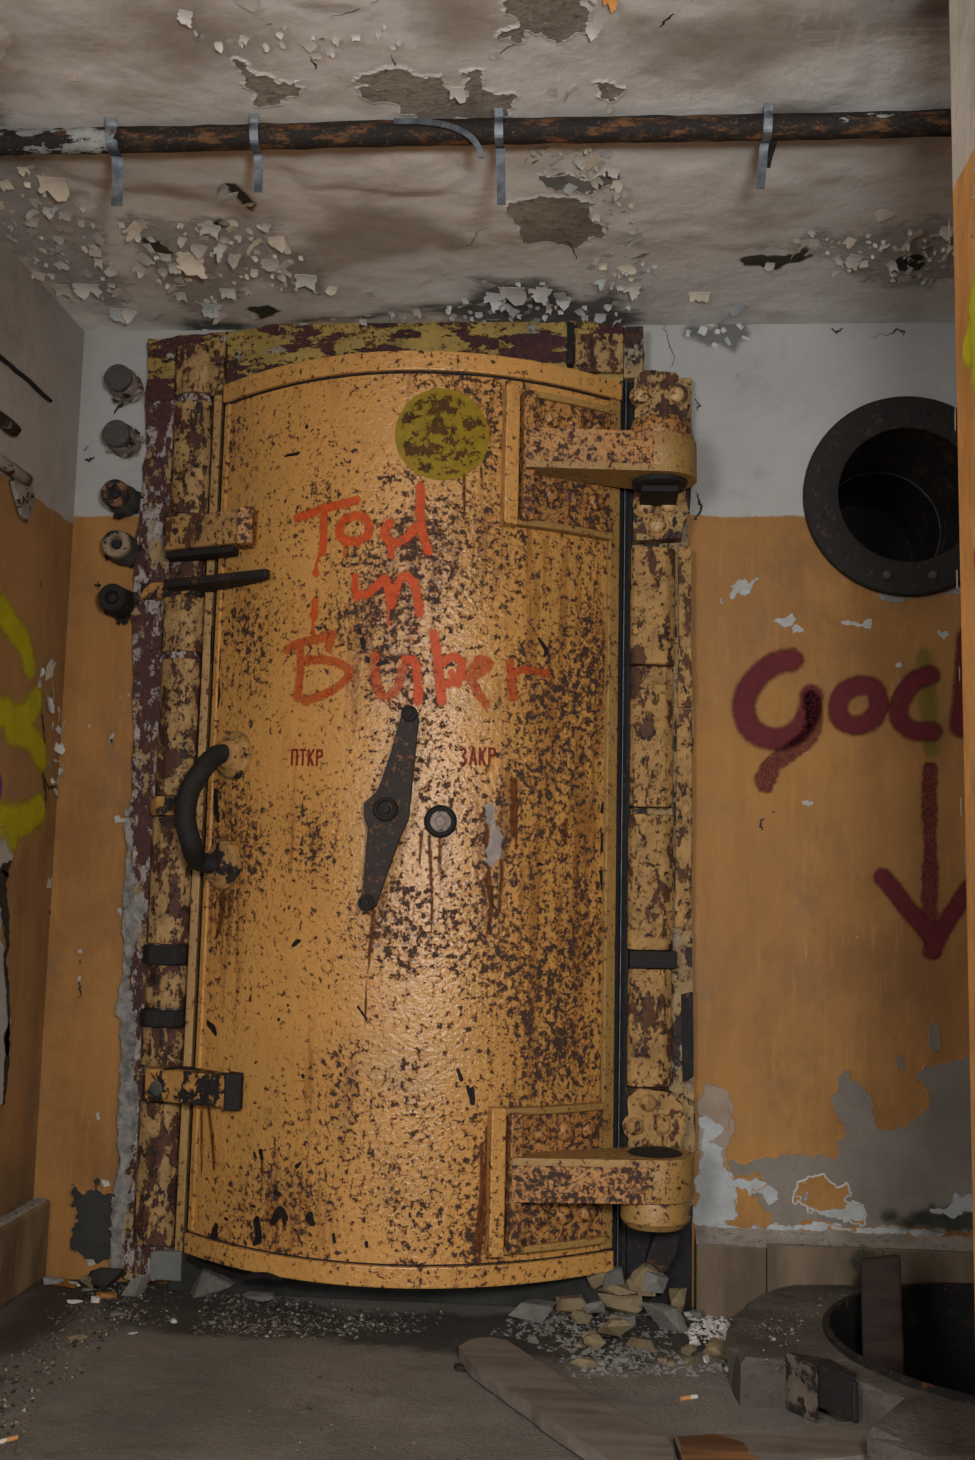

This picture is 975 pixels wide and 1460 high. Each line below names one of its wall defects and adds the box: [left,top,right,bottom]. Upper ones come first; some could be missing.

peeling [176,0,630,119]
peeling [0,156,338,332]
peeling [740,208,954,289]
corrosion [463,467,482,514]
flaking render [0,907,12,1107]
spalling [67,799,147,1269]
corrosion [368,910,376,966]
corrosion [419,831,442,932]
corrosion [485,779,518,934]
corrosion [200,1108,215,1173]
corrosion [474,1126,487,1264]
peeling [696,1020,973,1236]